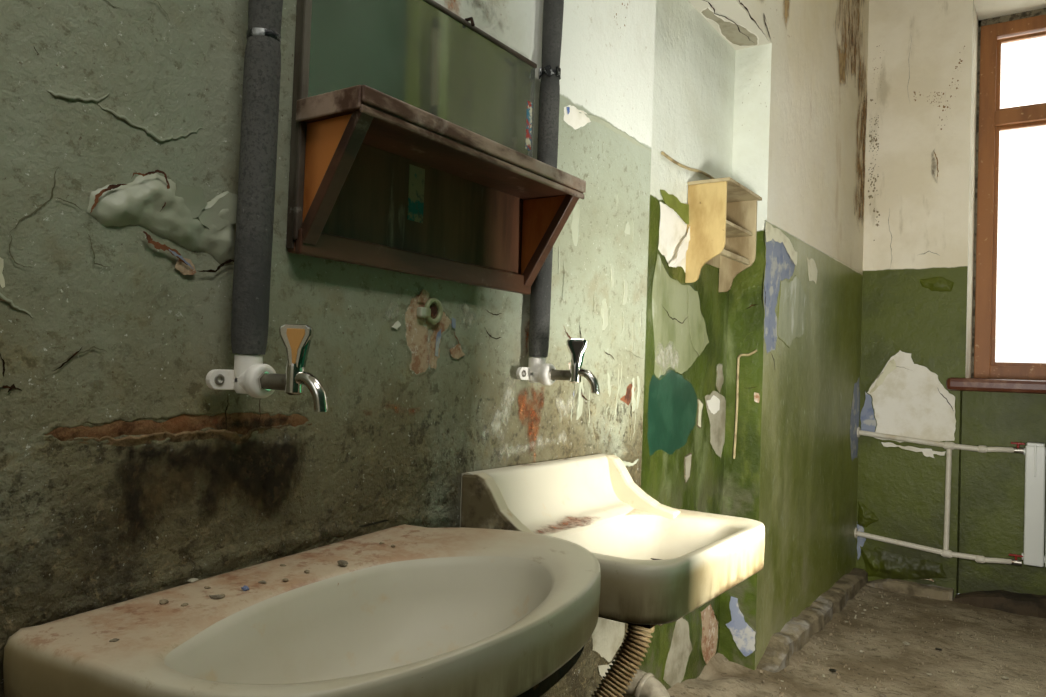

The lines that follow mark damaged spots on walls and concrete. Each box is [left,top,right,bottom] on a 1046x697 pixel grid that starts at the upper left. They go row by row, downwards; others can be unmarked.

water stain [835,0,881,227]
peeling [0,257,38,318]
peeling [392,286,465,377]
peeling [618,190,726,483]
peeling [763,220,862,367]
rust [519,389,544,465]
peeling [849,348,959,461]
water stain [118,435,303,541]
peeling [659,595,757,688]